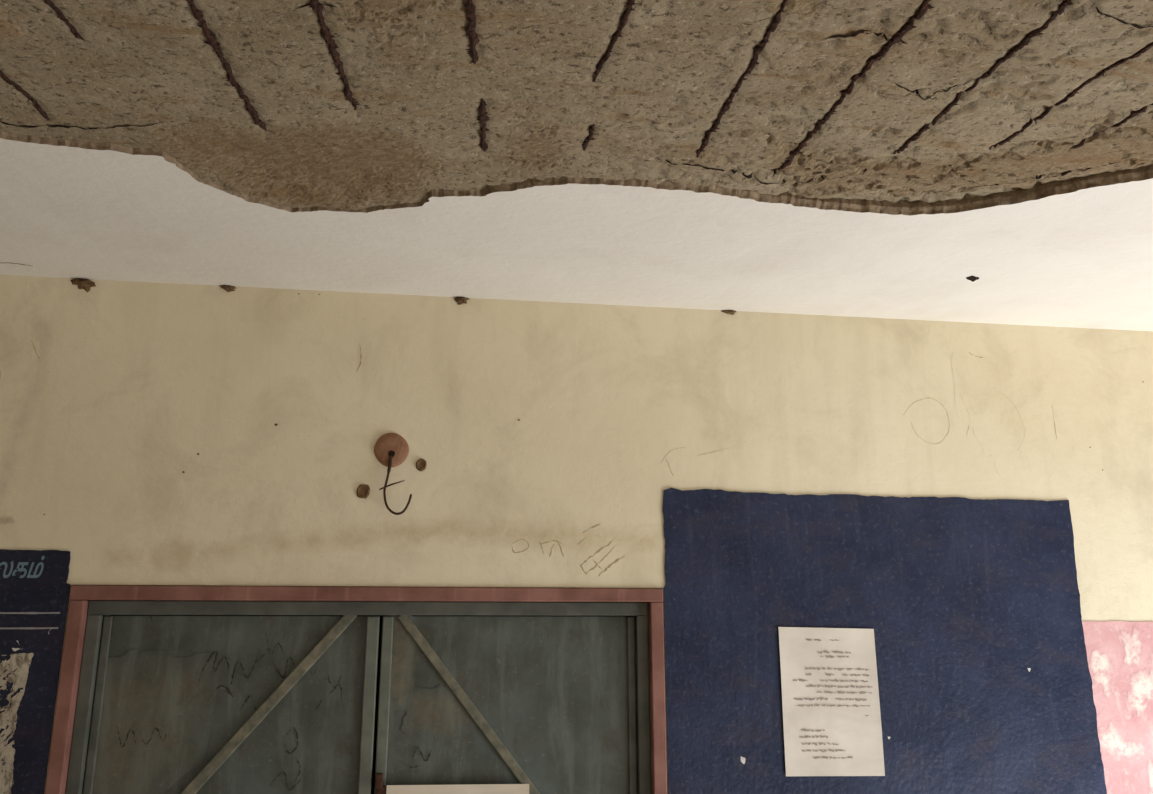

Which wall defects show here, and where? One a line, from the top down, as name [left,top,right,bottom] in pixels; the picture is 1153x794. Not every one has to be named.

spalling [0,0,1153,213]